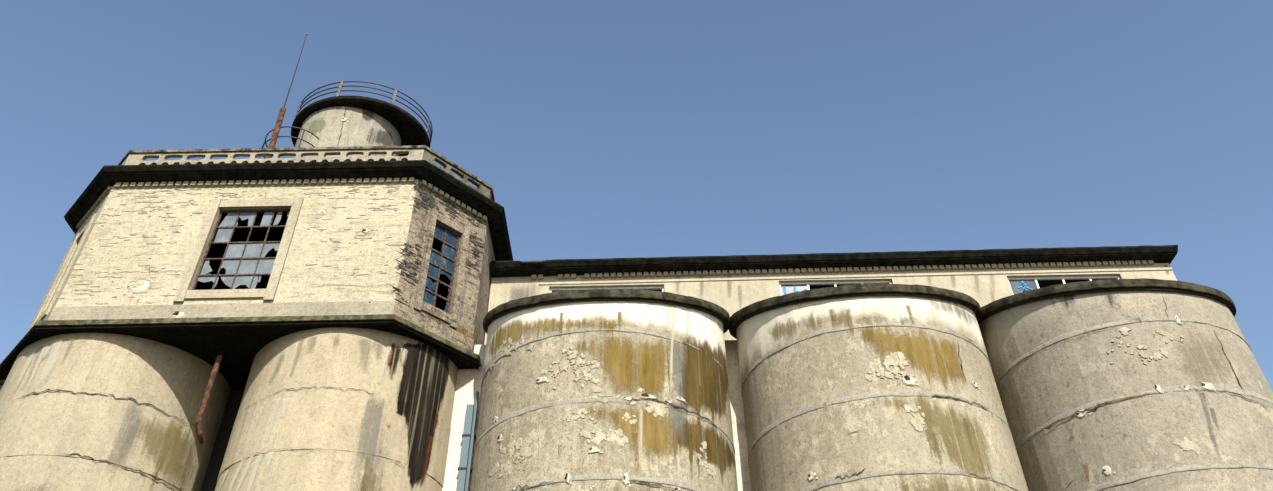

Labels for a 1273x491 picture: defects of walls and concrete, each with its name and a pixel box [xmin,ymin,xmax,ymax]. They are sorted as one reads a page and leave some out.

damp [362,342,450,491]
peeling [488,417,533,491]
peeling [536,345,687,454]
damp [490,305,735,477]
damp [772,305,965,386]
spalling [865,351,919,386]
peeling [903,404,925,432]
damp [895,395,990,491]
crack [1045,392,1156,429]